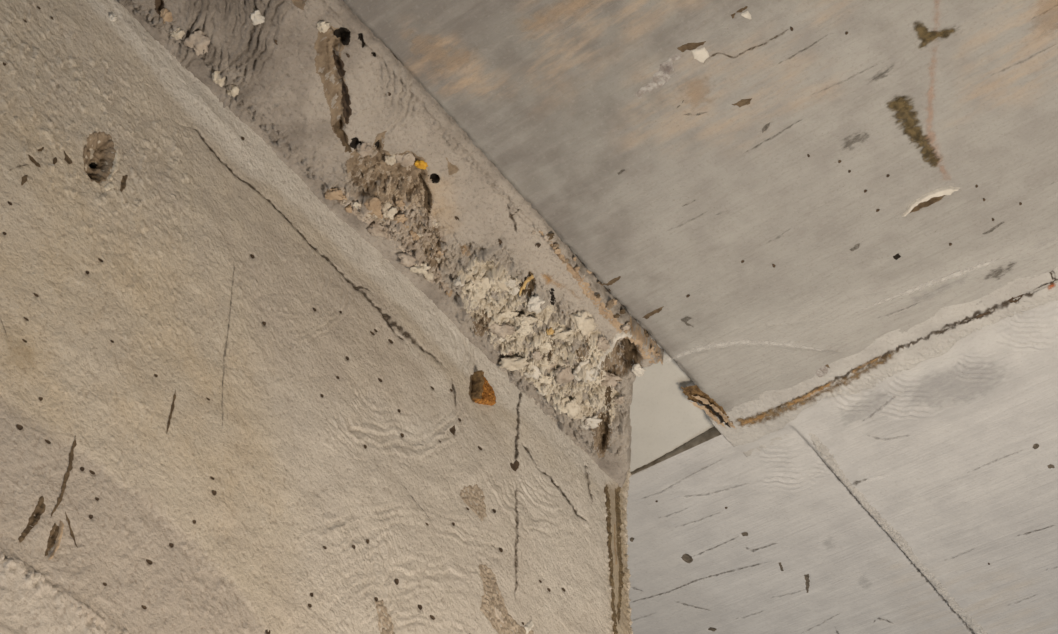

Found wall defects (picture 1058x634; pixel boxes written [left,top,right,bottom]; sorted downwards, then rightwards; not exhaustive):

spalling [314,21,352,135]
damp [887,96,940,167]
damp [914,23,954,48]
crack [194,129,435,359]
spalling [325,131,664,459]
crack [780,272,1057,406]